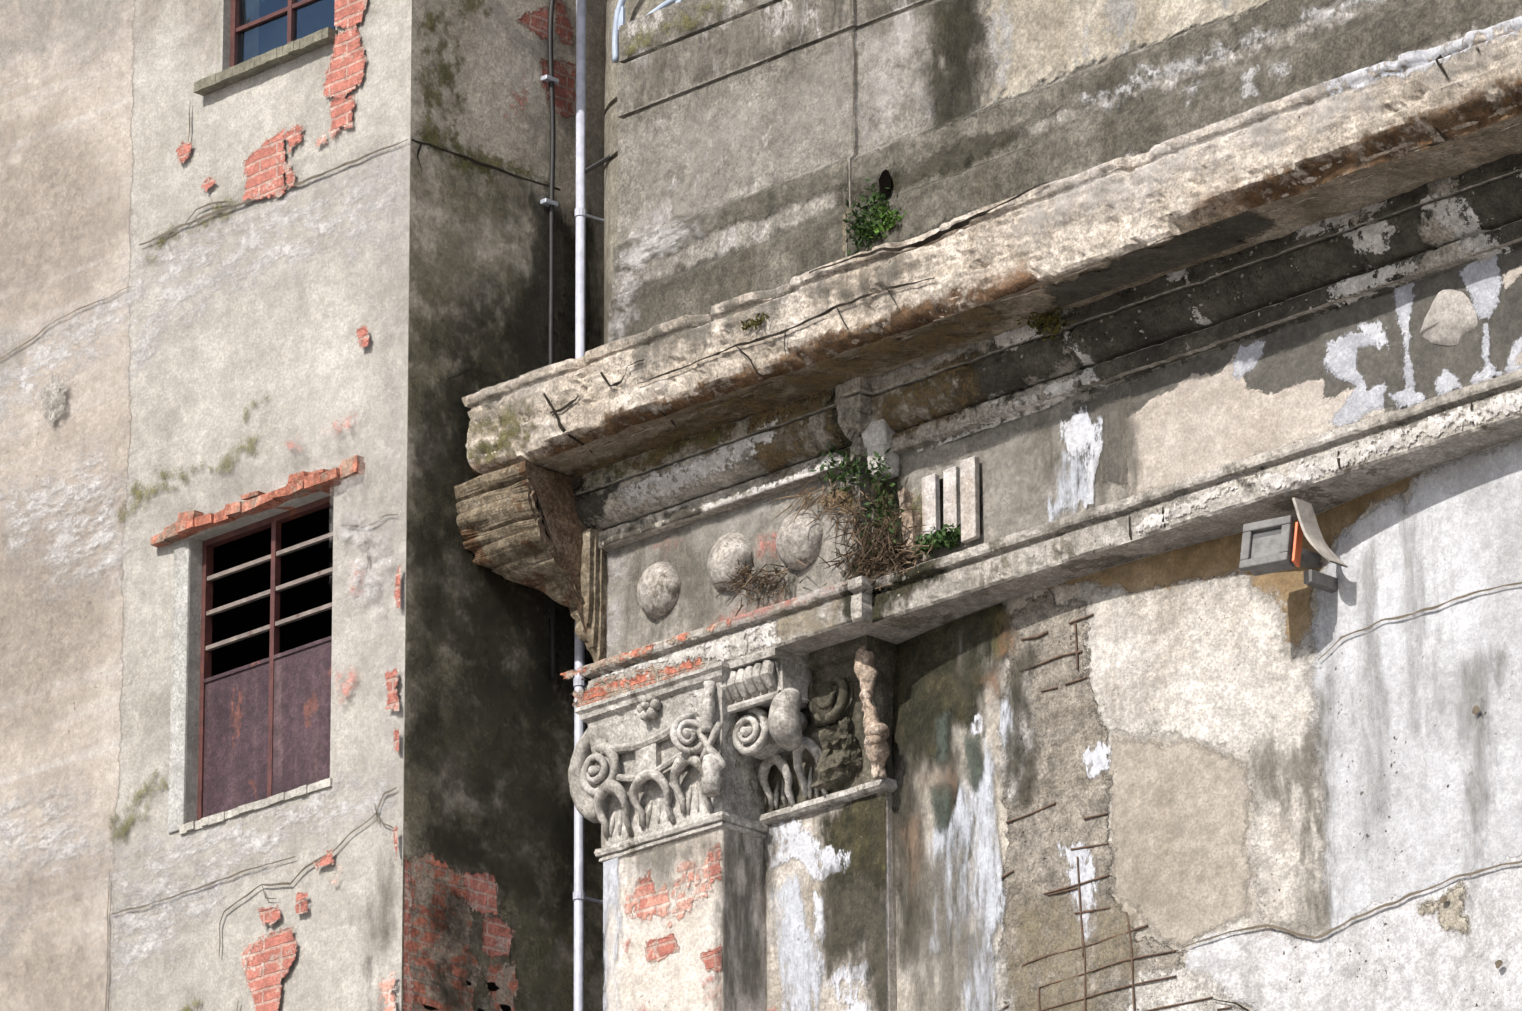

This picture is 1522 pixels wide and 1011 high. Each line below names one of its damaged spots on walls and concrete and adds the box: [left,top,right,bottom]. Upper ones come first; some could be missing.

peeling [0,0,406,423]
corrosion [1196,77,1522,219]
crack [543,182,1047,454]
damp [403,0,1522,1011]
peeling [1127,330,1522,497]
crack [1318,582,1522,660]
peeling [985,437,1522,1011]
crack [105,787,397,1011]
flaking render [241,891,308,1011]
flaking render [378,826,520,1011]
flaking render [623,842,721,963]
crack [1181,860,1522,948]